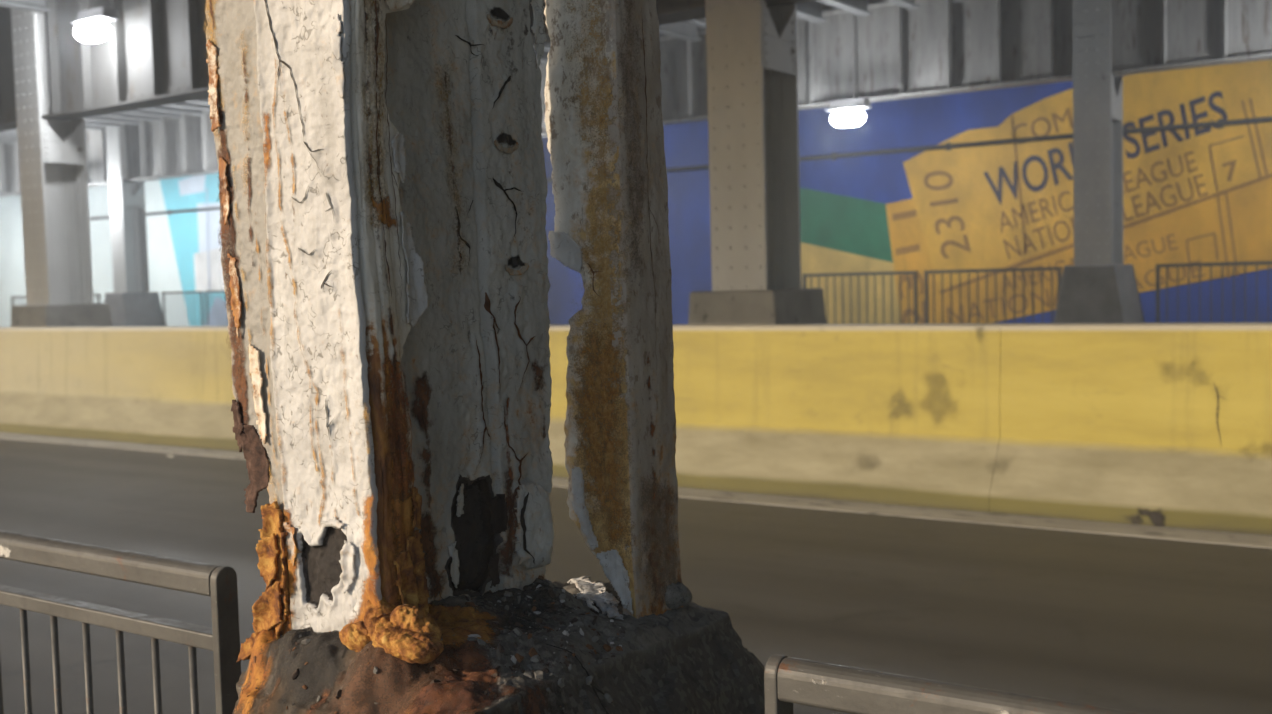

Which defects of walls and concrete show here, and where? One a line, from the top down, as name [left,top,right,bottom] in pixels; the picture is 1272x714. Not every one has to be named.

peeling [206,39,221,132]
crack [264,0,334,219]
crack [298,248,332,289]
crack [455,178,524,265]
peeling [227,254,268,452]
rust [237,499,298,714]
peeling [283,522,303,566]
peeling [321,517,356,594]
rust [350,457,380,624]
rust [382,353,445,599]
rust [305,633,551,714]
crack [476,292,535,505]